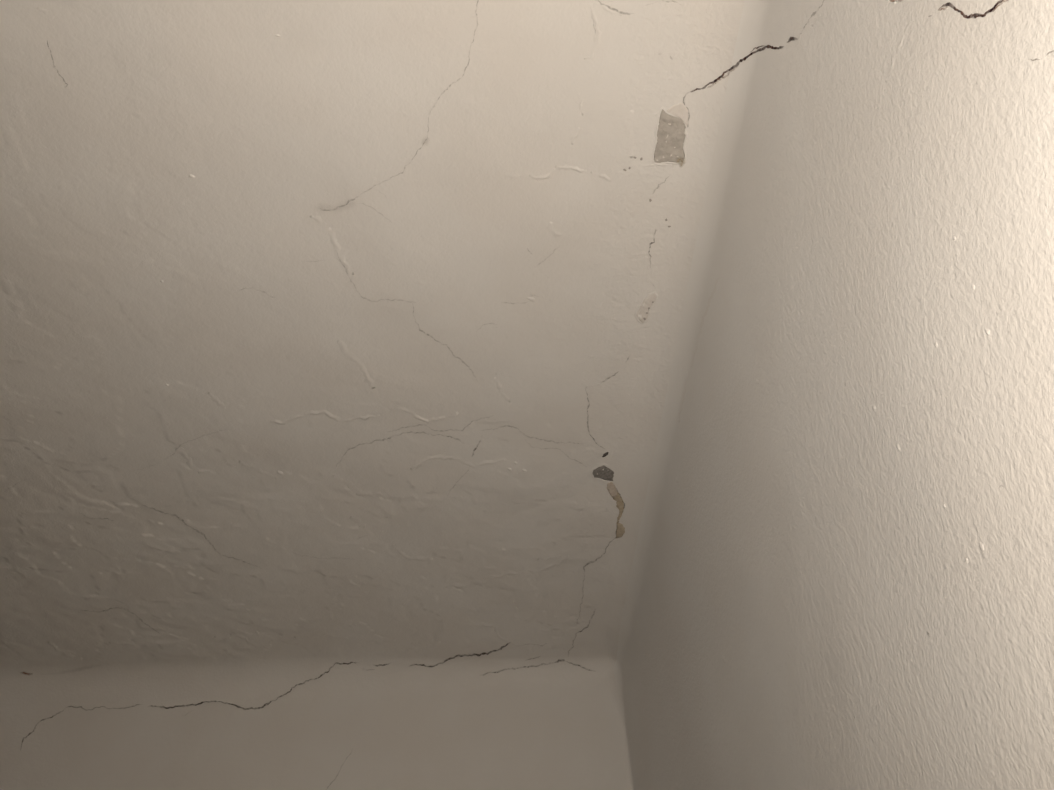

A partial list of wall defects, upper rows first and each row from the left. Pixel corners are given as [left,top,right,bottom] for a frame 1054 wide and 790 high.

crack [940,0,1003,19]
crack [691,15,821,92]
spalling [623,102,689,171]
spalling [588,450,625,538]
crack [415,644,508,673]